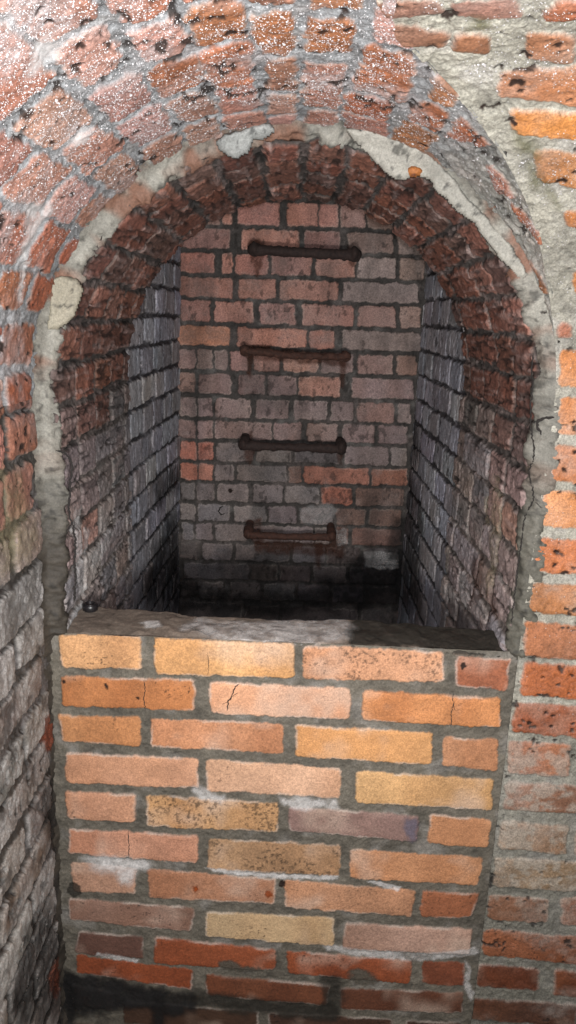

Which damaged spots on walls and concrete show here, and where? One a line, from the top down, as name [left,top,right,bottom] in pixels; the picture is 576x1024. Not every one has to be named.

peeling [38,276,84,330]
crack [511,356,554,622]